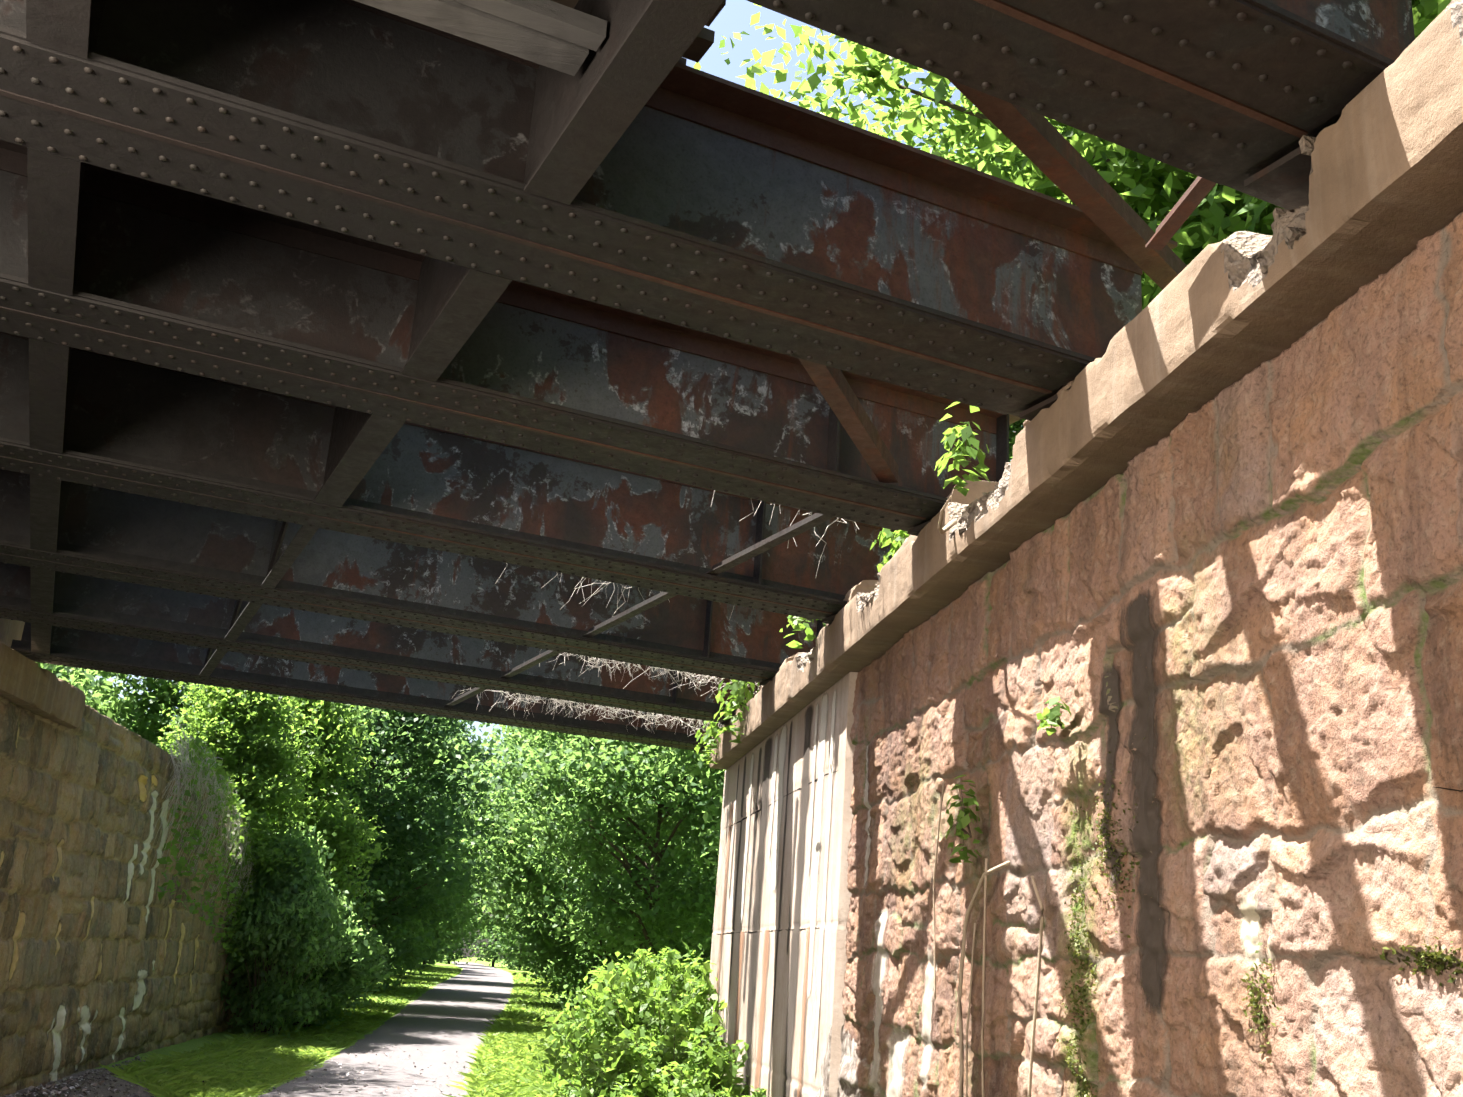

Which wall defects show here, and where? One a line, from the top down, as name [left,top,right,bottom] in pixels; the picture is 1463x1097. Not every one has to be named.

spalling [1445,0,1463,46]
leakage [8,910,26,981]
leakage [112,790,200,1058]
leakage [47,1005,98,1082]